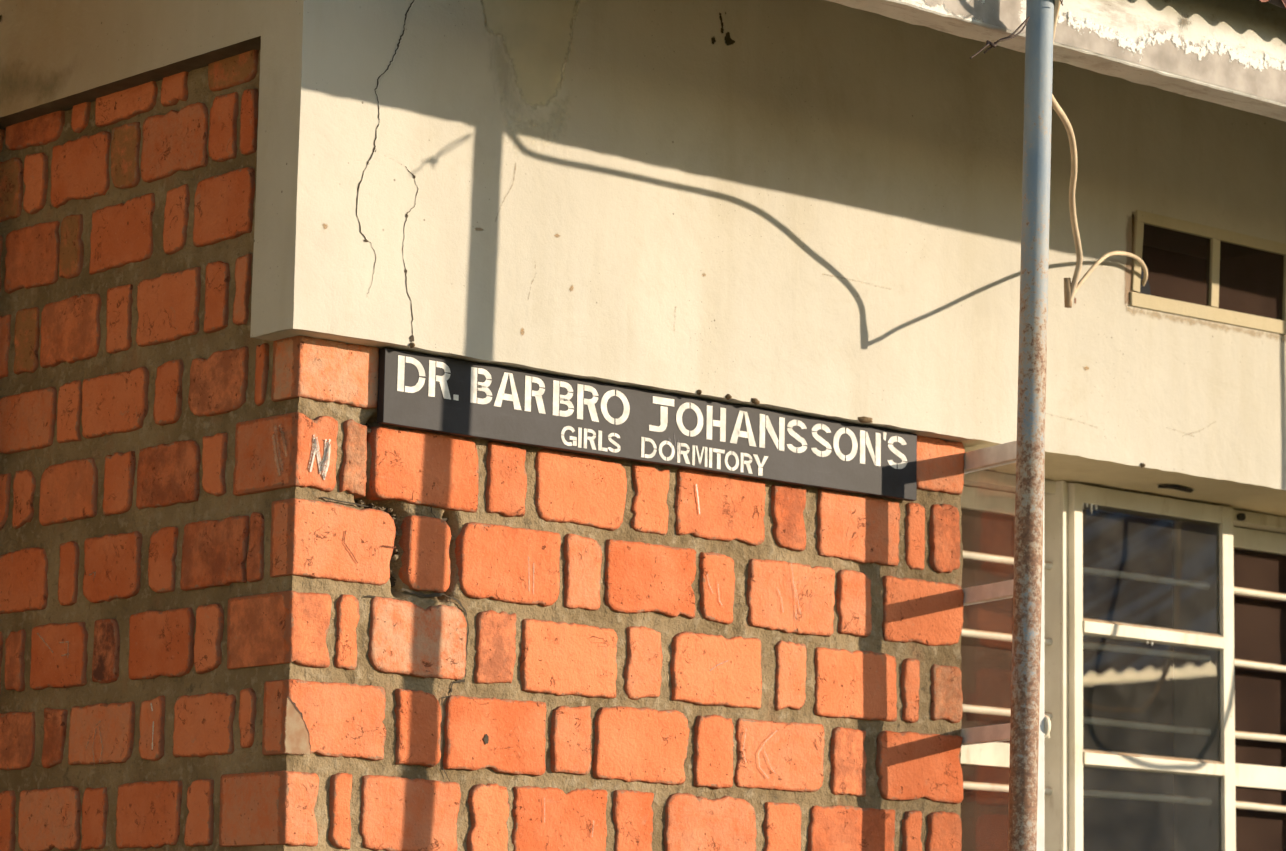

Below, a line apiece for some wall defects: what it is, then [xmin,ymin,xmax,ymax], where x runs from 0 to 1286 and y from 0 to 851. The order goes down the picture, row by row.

peeling [924,0,1026,34]
peeling [1054,10,1286,104]
crack [356,0,418,342]